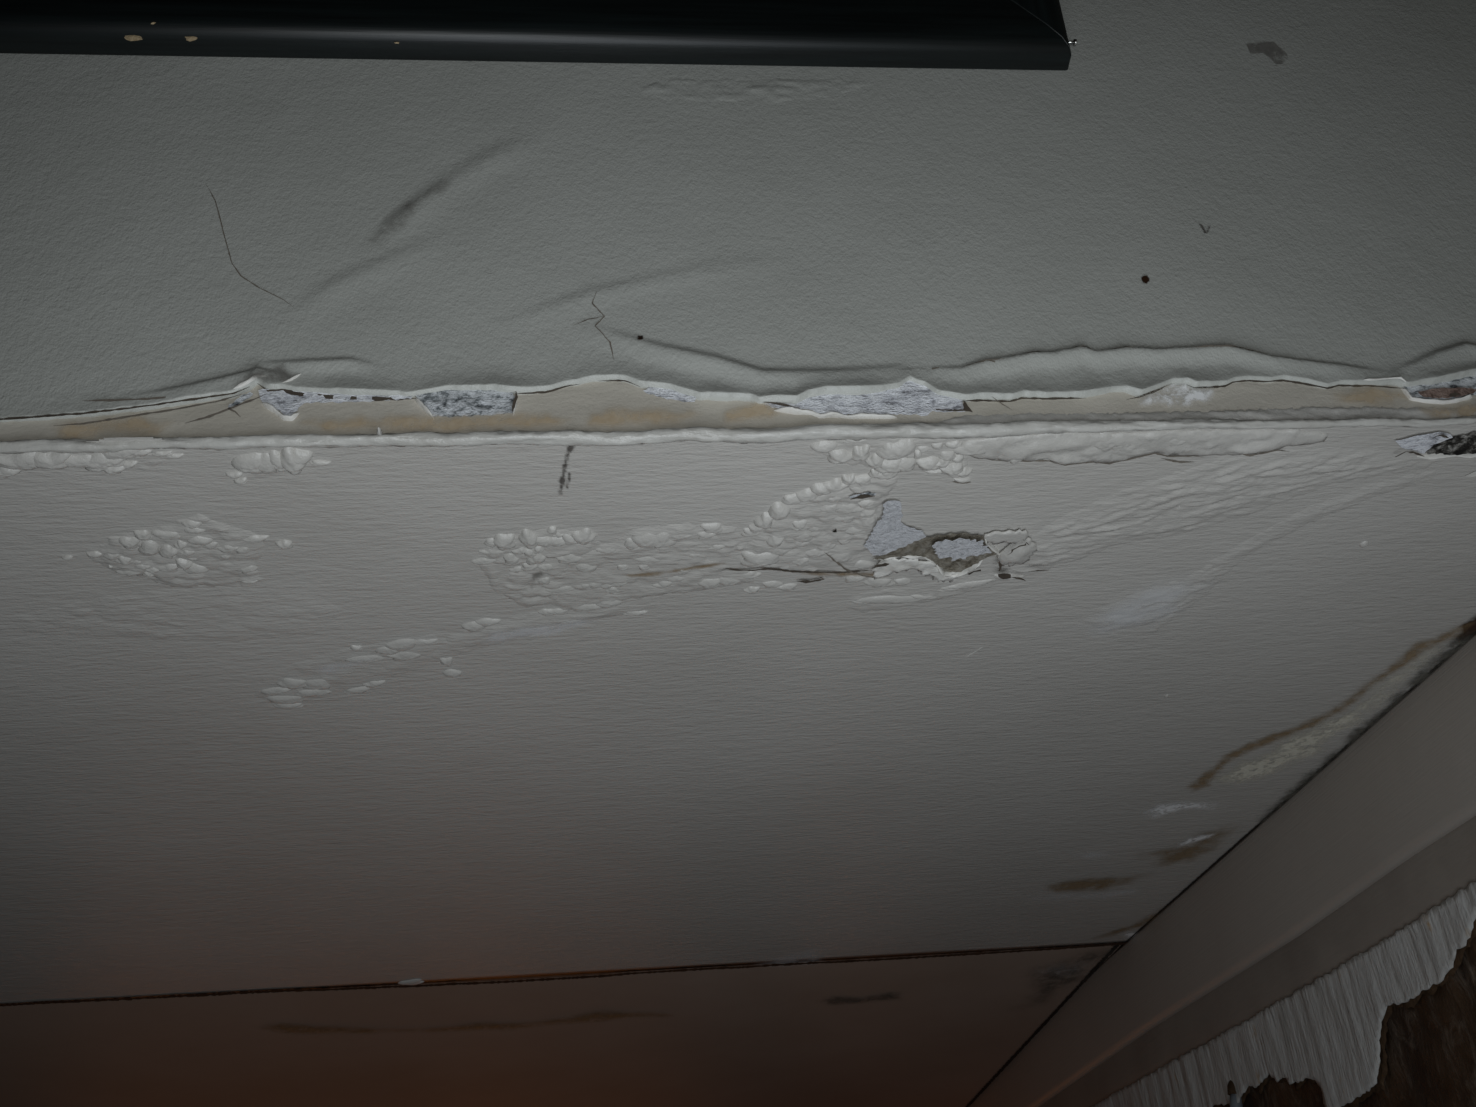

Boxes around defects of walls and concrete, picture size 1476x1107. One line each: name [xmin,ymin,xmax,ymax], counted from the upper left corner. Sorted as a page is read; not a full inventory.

crack [207,186,292,306]
crack [0,373,418,425]
peeling [228,389,517,421]
crack [512,291,637,412]
peeling [763,381,972,419]
crack [932,345,1132,409]
crack [1127,345,1406,400]
peeling [1401,361,1476,405]
peeling [1395,432,1476,477]
leakage [1149,618,1476,821]